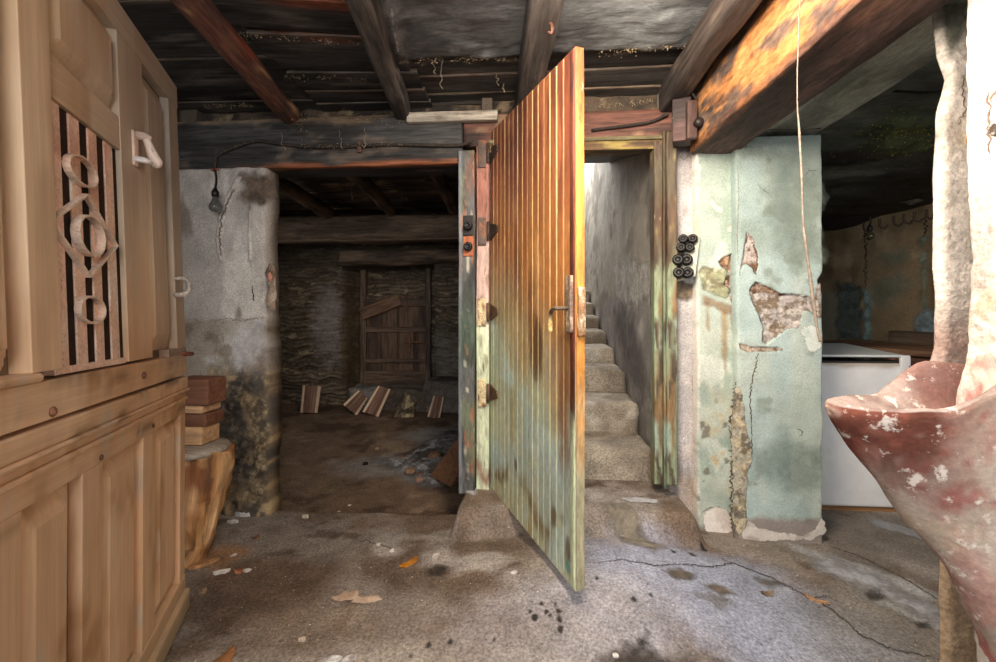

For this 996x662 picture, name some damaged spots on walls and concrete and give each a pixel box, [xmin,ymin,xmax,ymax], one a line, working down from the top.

crack [958,74,996,153]
spalling [719,232,821,352]
damp [219,377,248,487]
peeling [702,387,826,541]
crack [597,353,937,659]
damp [626,640,657,662]